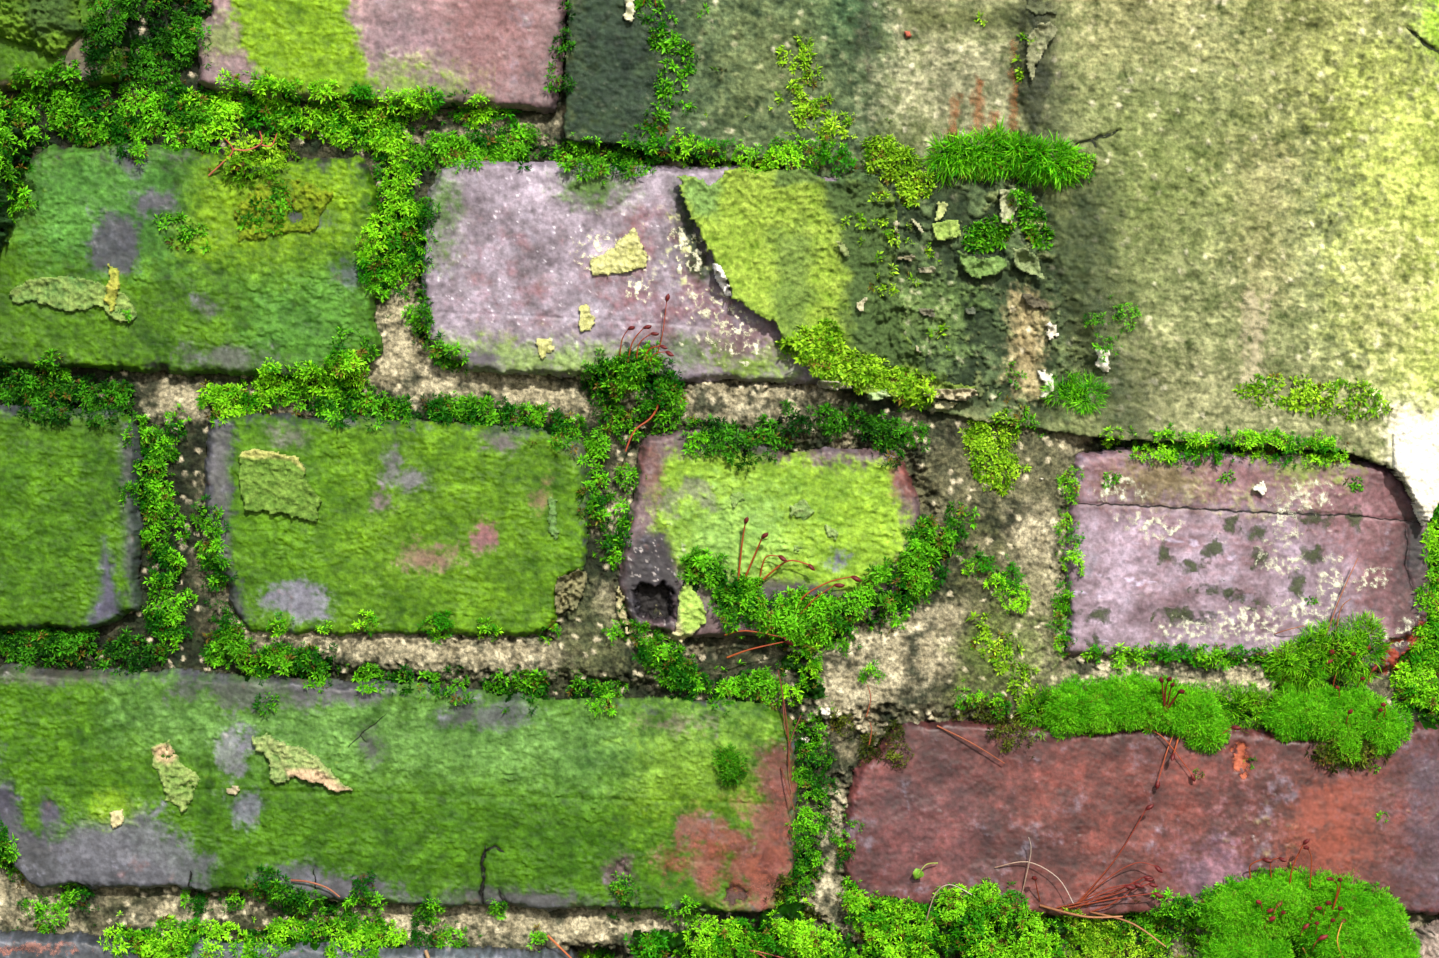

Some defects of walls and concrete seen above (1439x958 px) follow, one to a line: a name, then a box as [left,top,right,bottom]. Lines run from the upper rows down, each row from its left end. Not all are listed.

flaking render [1390,427,1439,526]
spalling [634,581,674,619]